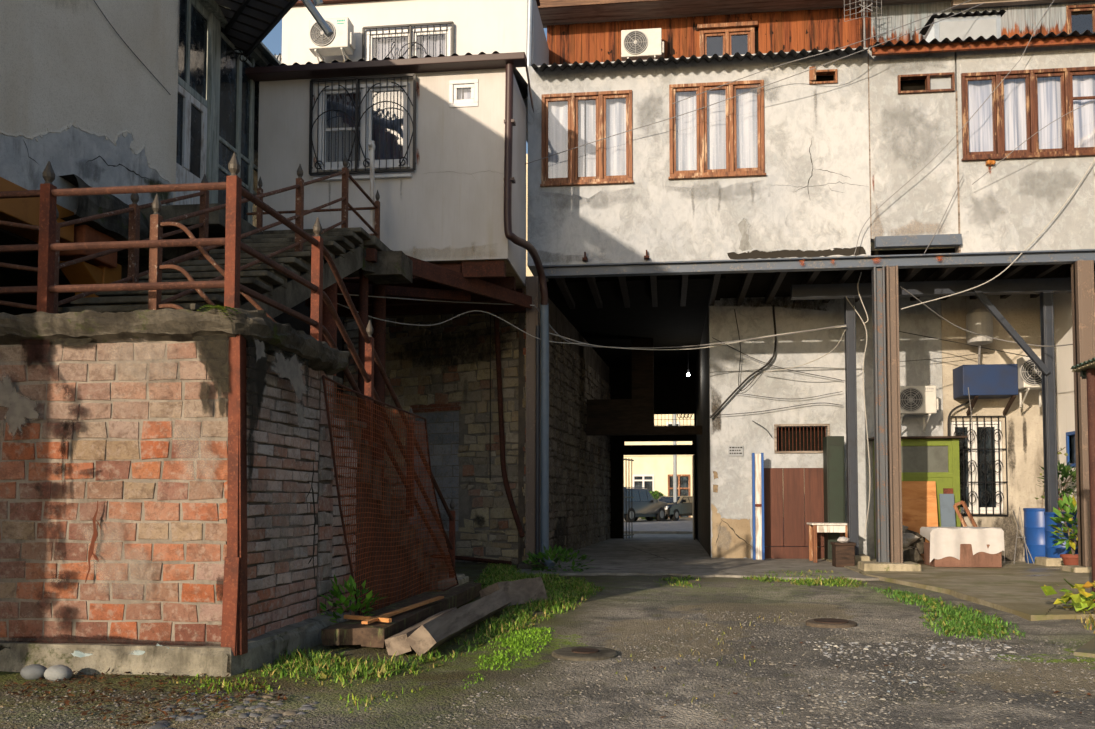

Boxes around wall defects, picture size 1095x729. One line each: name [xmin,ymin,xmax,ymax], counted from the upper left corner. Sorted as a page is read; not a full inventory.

peeling [0,121,173,211]
crack [773,141,868,197]
leakage [21,338,91,630]